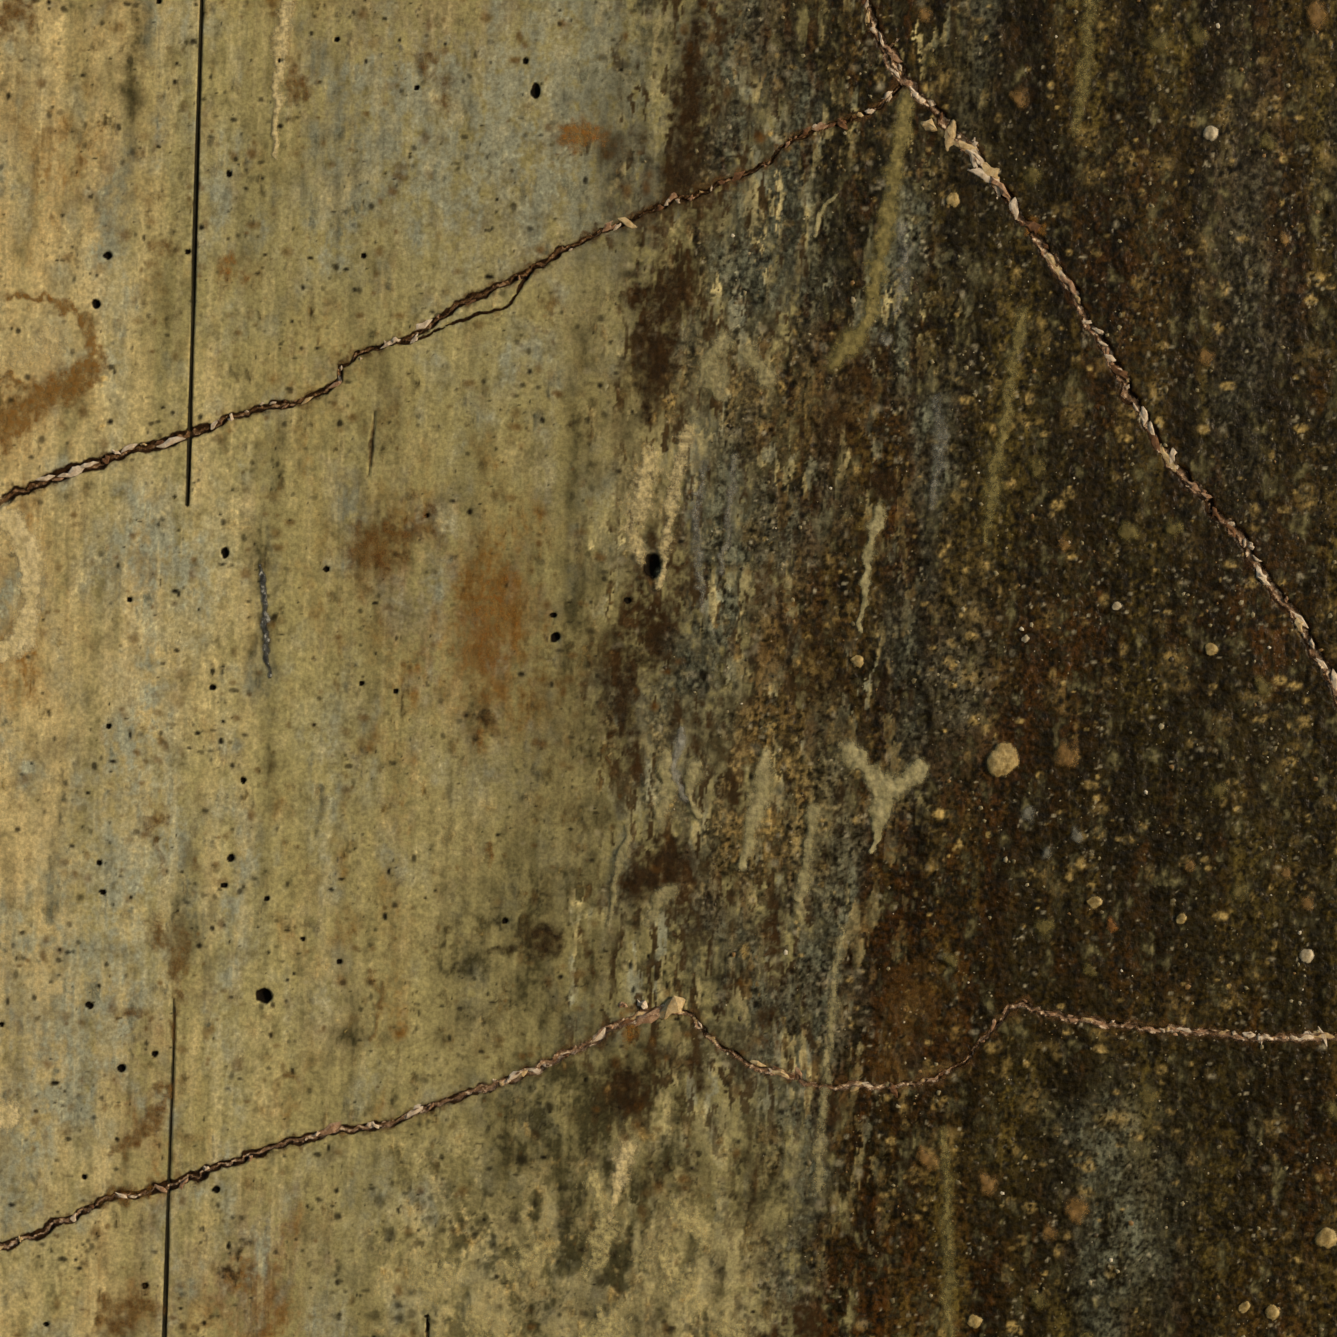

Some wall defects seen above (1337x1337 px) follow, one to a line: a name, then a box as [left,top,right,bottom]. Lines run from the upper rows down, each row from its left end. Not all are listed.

leakage [1072,0,1095,133]
leakage [621,262,689,422]
crack [0,0,1337,707]
leakage [813,193,838,237]
leakage [829,92,913,400]
leakage [982,308,1027,542]
leakage [856,468,903,633]
leakage [607,823,697,927]
leakage [812,928,845,1192]
leakage [606,1141,637,1222]
crack [0,995,1337,1337]
leakage [940,1127,957,1337]